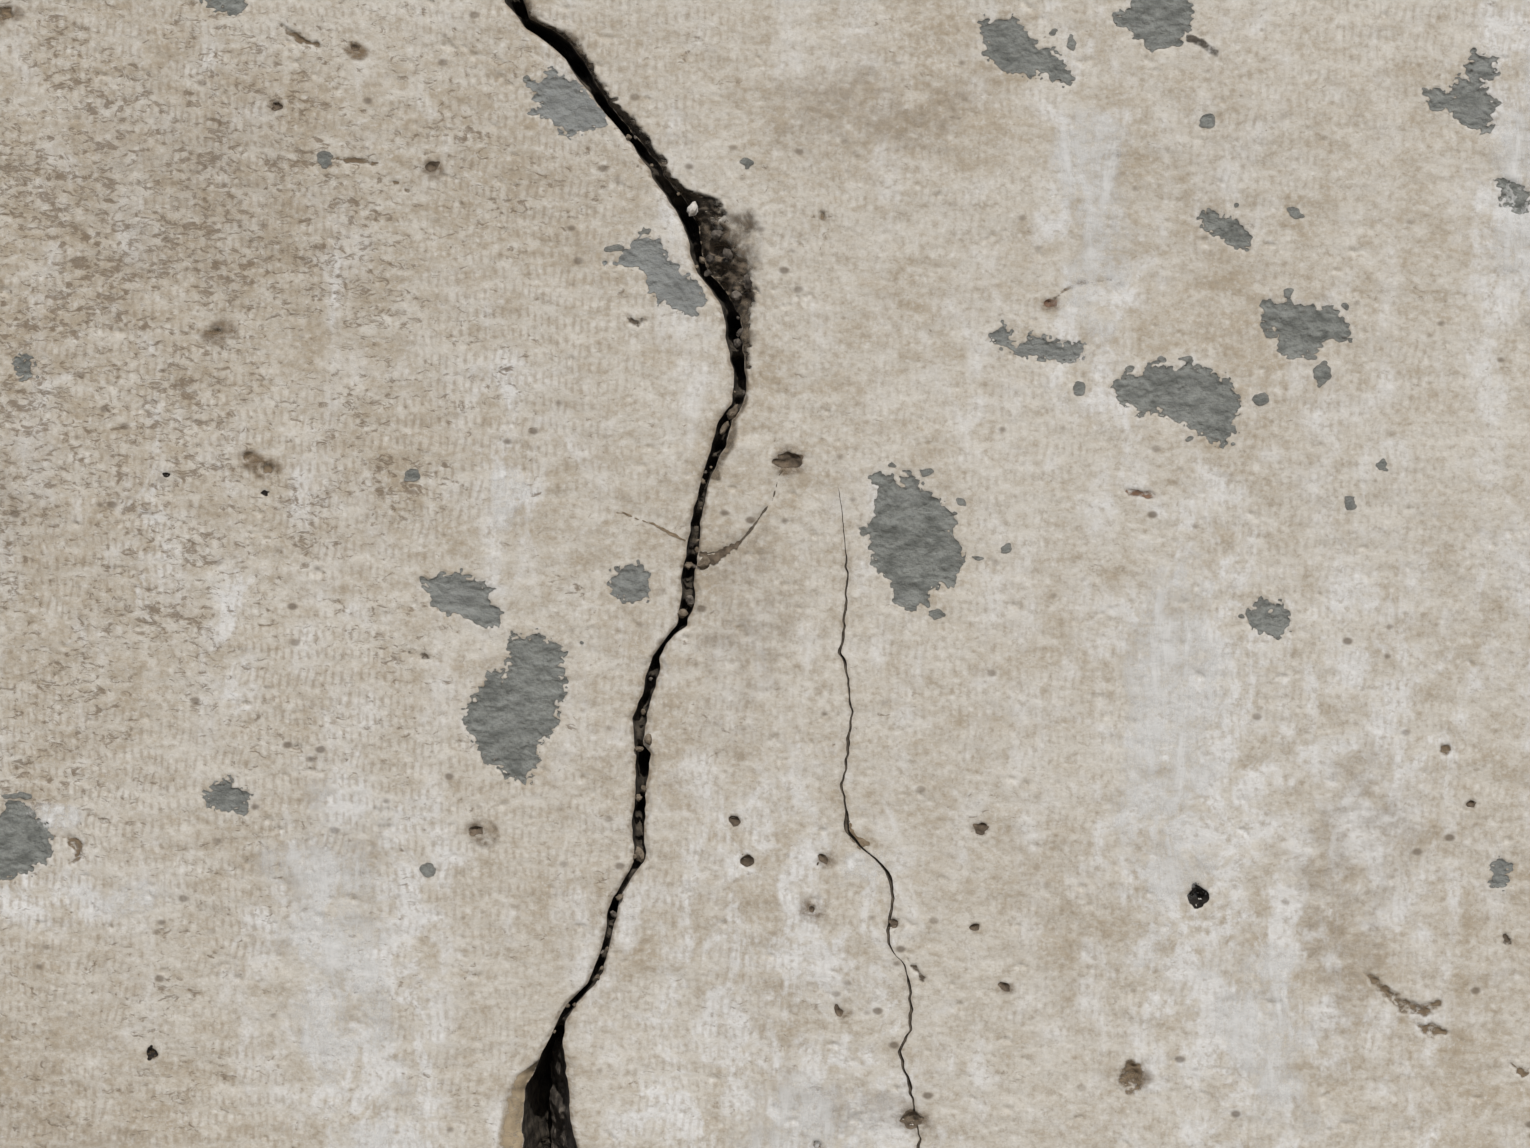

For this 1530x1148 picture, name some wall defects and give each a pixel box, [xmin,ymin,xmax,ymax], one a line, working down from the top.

peeling [523,66,608,140]
peeling [977,14,1077,87]
peeling [1112,0,1218,54]
peeling [1422,48,1502,134]
peeling [602,227,708,316]
peeling [1259,288,1352,387]
peeling [1111,356,1269,448]
crack [500,0,783,1148]
peeling [859,462,984,620]
peeling [420,568,584,785]
peeling [0,792,83,880]
crack [838,488,921,1148]